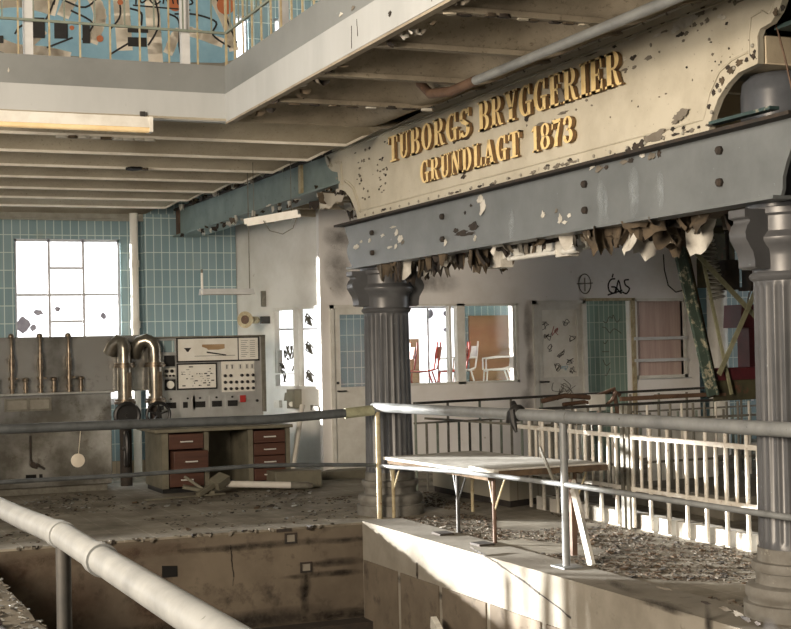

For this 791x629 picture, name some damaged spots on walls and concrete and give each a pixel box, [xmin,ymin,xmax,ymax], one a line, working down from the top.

spalling [386,0,472,48]
spalling [484,12,589,27]
peeling [620,6,728,82]
spalling [248,64,376,116]
peeling [524,77,593,129]
peeling [707,47,756,109]
peeling [612,108,713,165]
peeling [179,167,287,211]
flaking render [197,185,357,236]
peeling [354,147,388,200]
peeling [377,182,733,287]